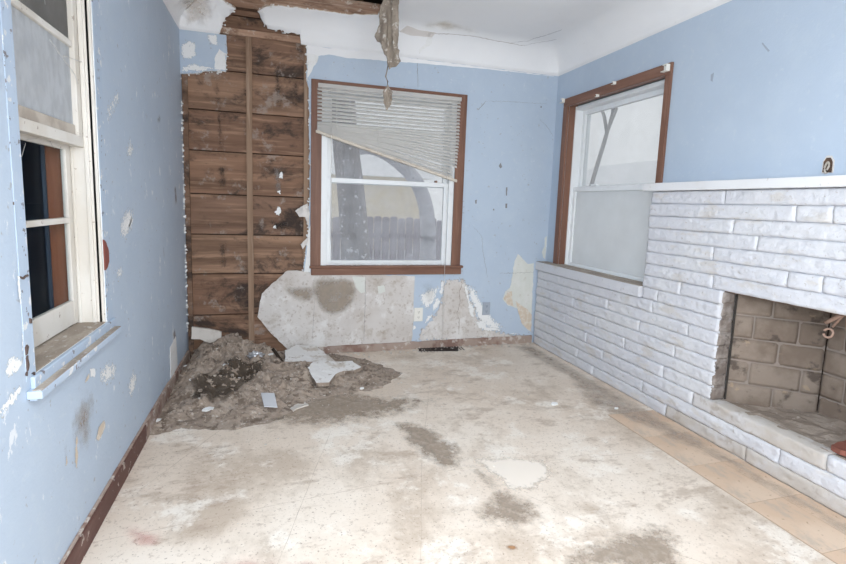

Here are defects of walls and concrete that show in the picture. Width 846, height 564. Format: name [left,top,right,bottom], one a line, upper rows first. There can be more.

spalling [180,35,228,79]
peeling [305,46,318,81]
water stain [293,281,353,312]
flaking render [257,224,534,349]
spalling [5,333,36,377]
spalling [85,363,116,386]
spalling [0,386,21,418]